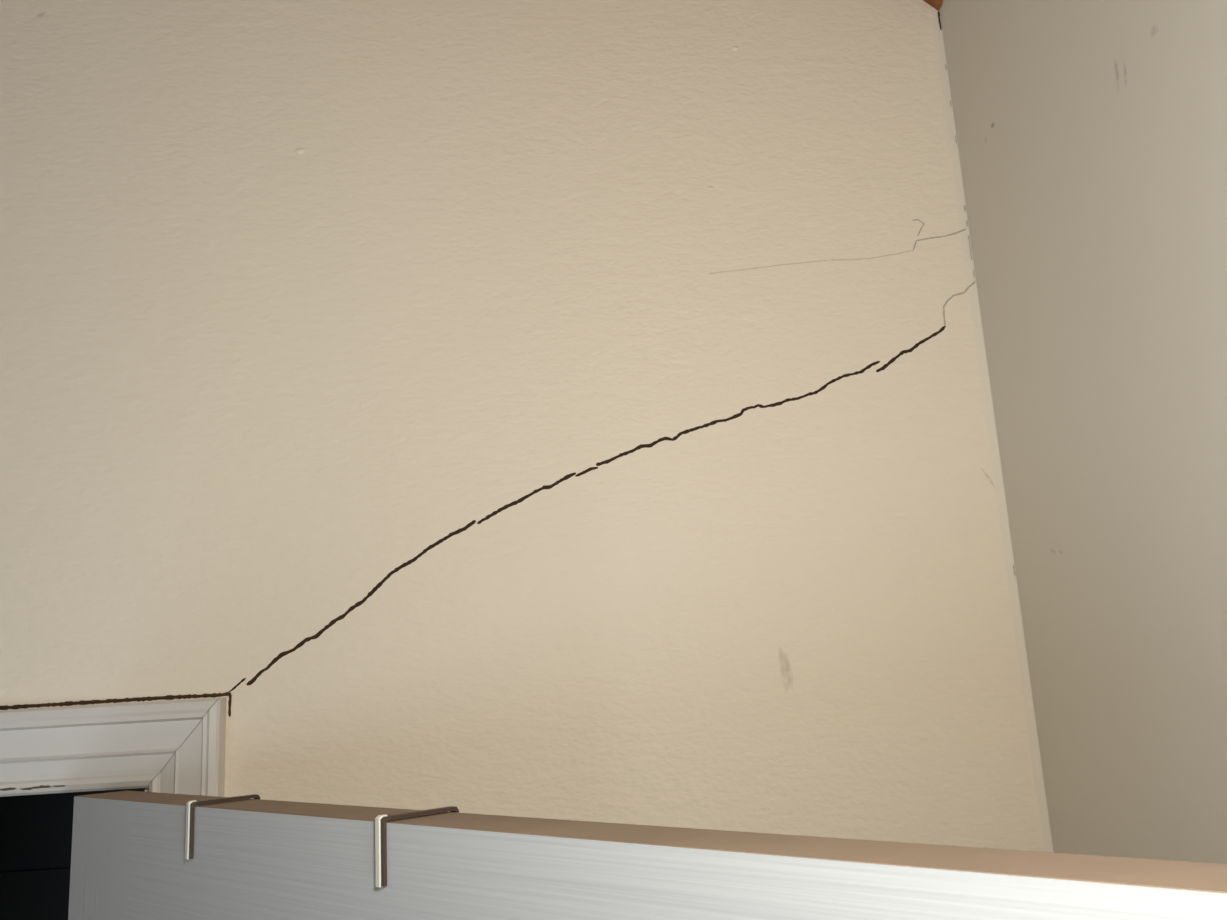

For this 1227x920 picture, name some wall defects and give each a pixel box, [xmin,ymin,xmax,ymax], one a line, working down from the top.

crack [228,205,975,693]